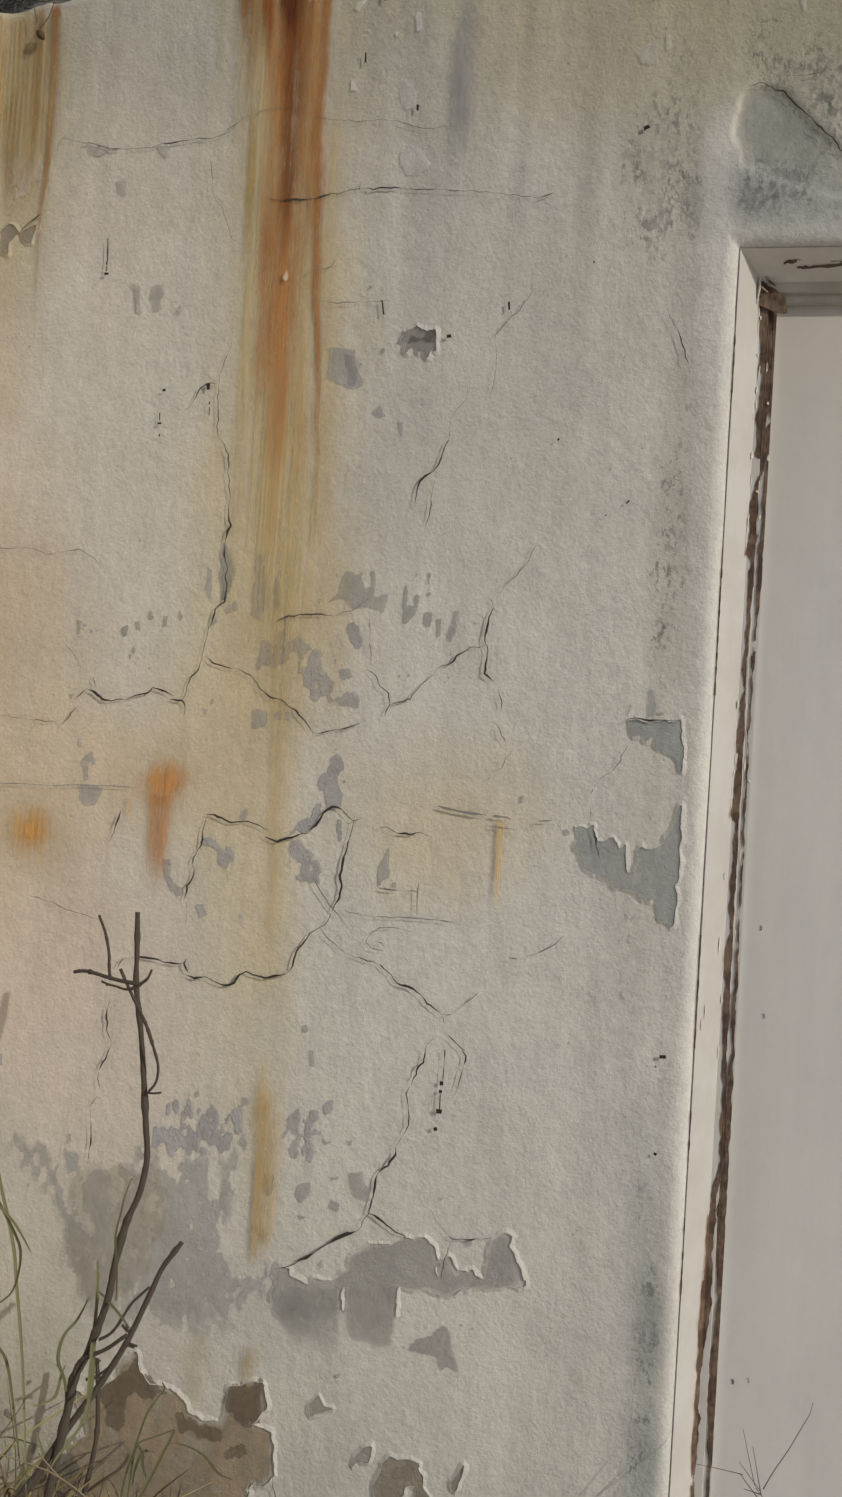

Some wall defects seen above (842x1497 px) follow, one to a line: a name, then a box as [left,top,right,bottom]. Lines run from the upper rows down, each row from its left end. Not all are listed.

rust [0,5,61,225]
rust [784,259,842,269]
crack [414,284,534,533]
crack [3,342,539,778]
peeling [625,690,688,777]
peeling [563,801,687,931]
rust [690,276,788,1497]
crack [87,806,493,1277]
peeling [131,1091,249,1318]
peeling [265,1228,530,1317]
spalling [24,1347,278,1497]
spalling [348,1441,469,1497]